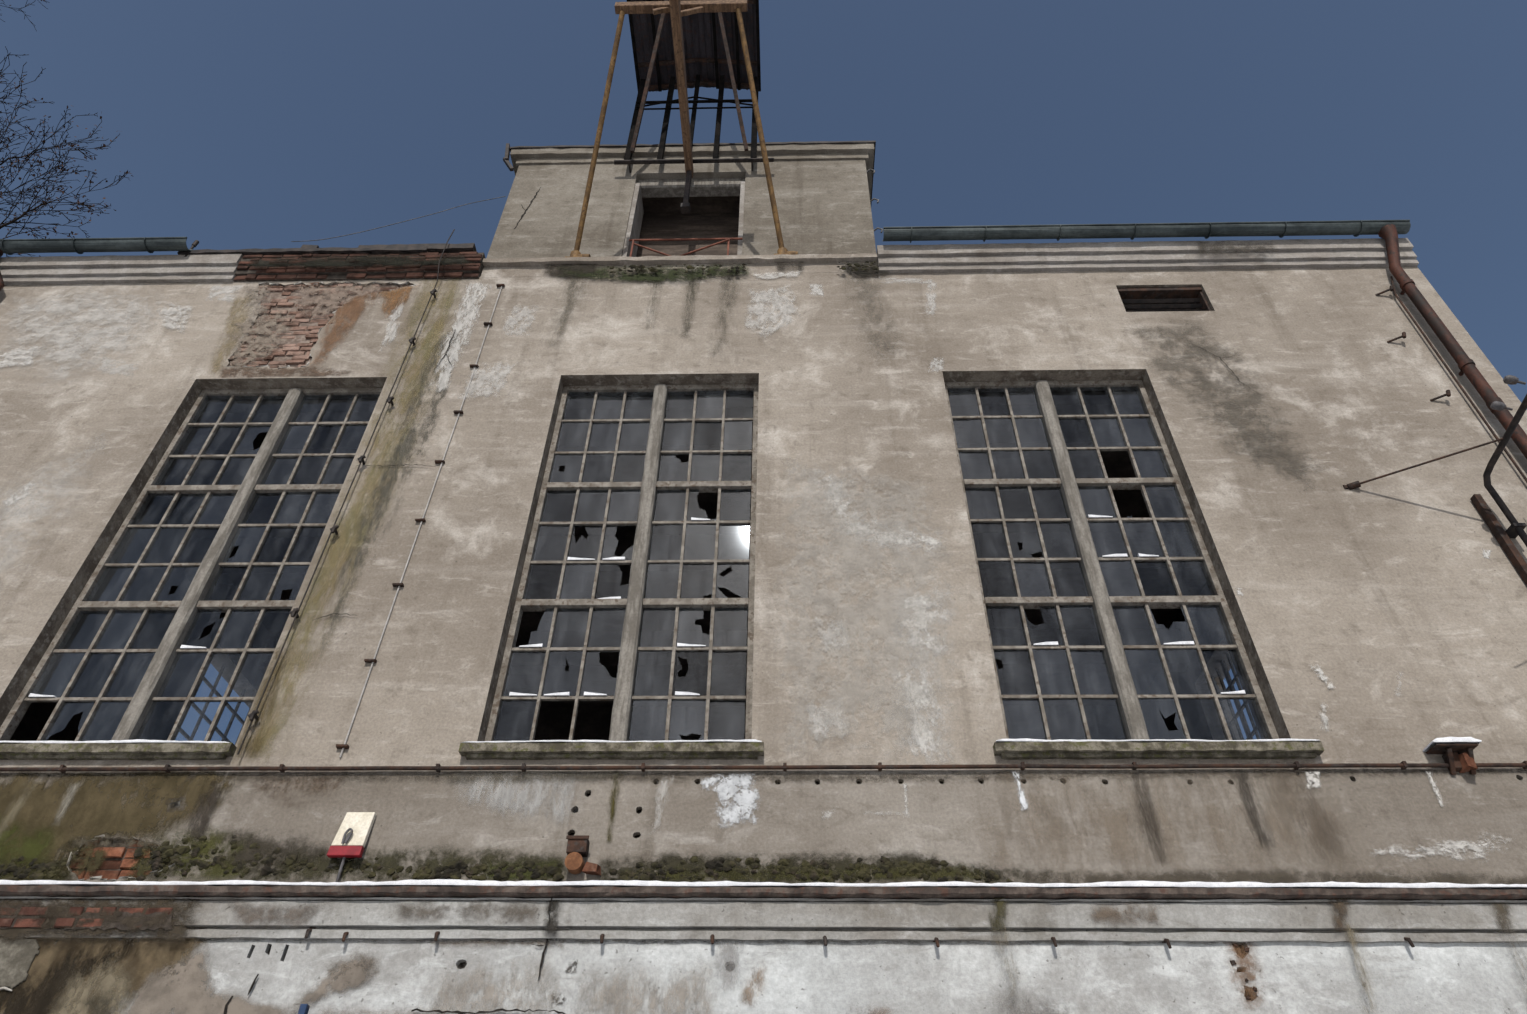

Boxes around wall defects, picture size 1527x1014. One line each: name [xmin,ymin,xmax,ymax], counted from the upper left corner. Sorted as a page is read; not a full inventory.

flaking render [226,281,416,368]
damp [0,771,235,881]
flaking render [66,834,175,881]
damp [228,832,323,869]
damp [401,900,560,945]
damp [0,898,373,1014]
damp [592,976,710,1014]